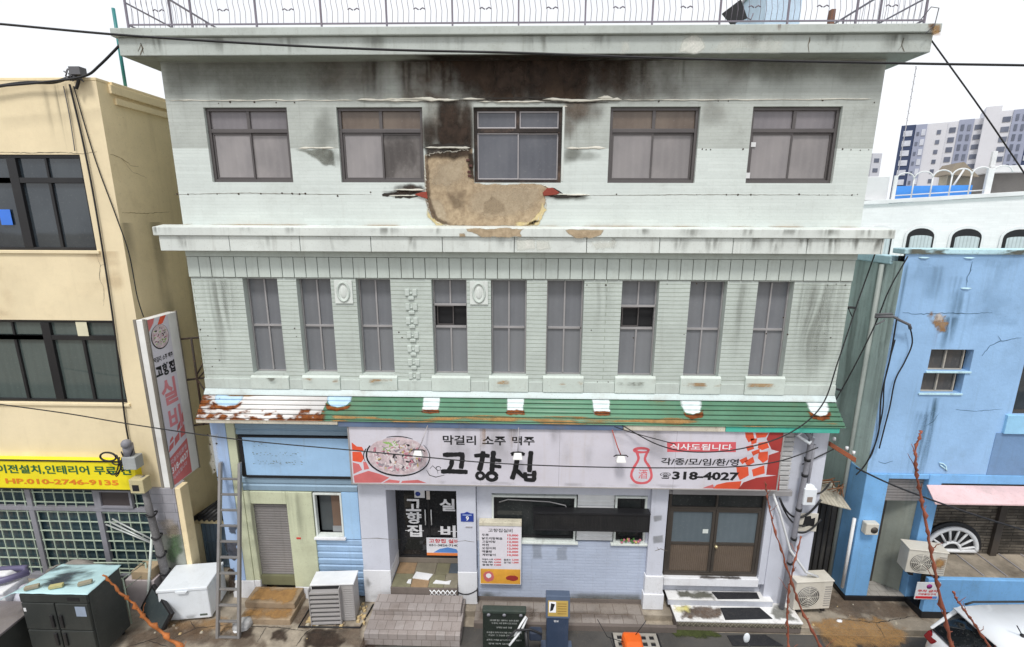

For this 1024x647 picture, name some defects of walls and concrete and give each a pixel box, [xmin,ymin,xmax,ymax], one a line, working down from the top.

spalling [424,146,550,250]
spalling [566,229,603,238]
peeling [930,313,948,332]
crack [910,312,1016,356]
rust [195,395,696,425]